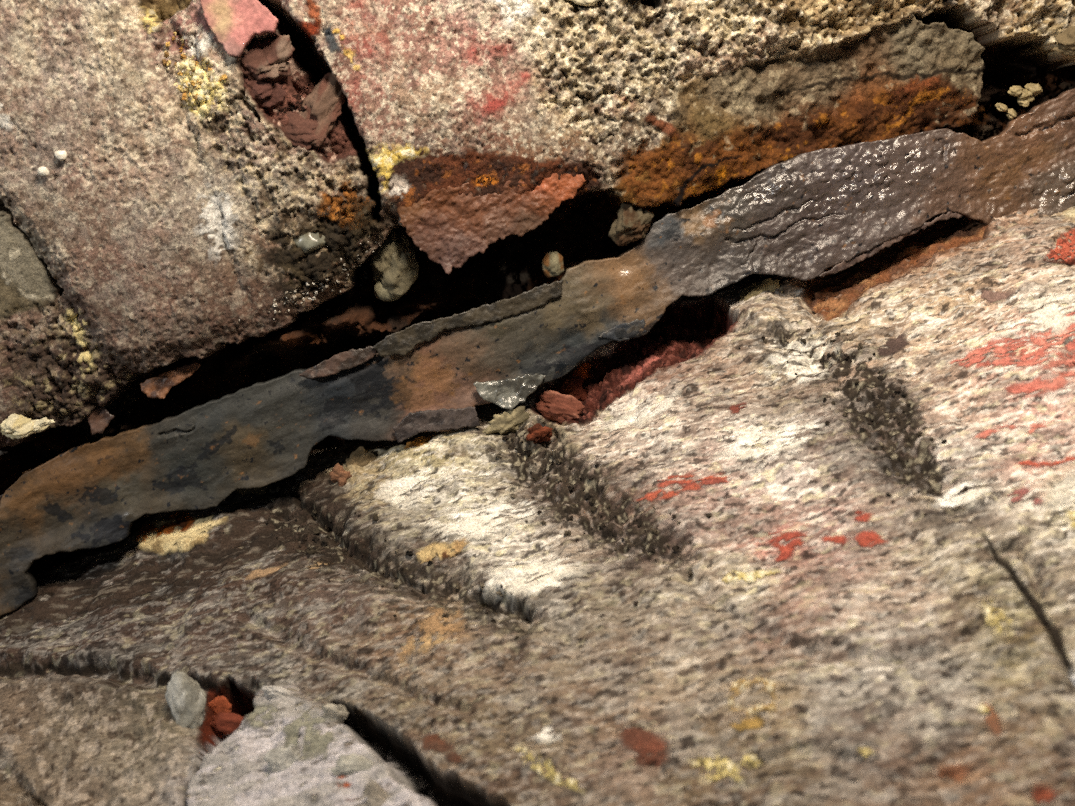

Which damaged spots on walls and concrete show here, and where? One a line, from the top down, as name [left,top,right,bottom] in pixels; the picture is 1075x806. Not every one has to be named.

spalling [139,0,358,163]
corrosion [621,75,981,212]
corrosion [320,182,374,233]
corrosion [379,147,606,275]
corrosion [804,211,988,321]
corrosion [86,406,115,435]
corrosion [140,362,201,399]
corrosion [299,280,564,379]
corrosion [392,406,480,443]
crack [981,534,1075,685]